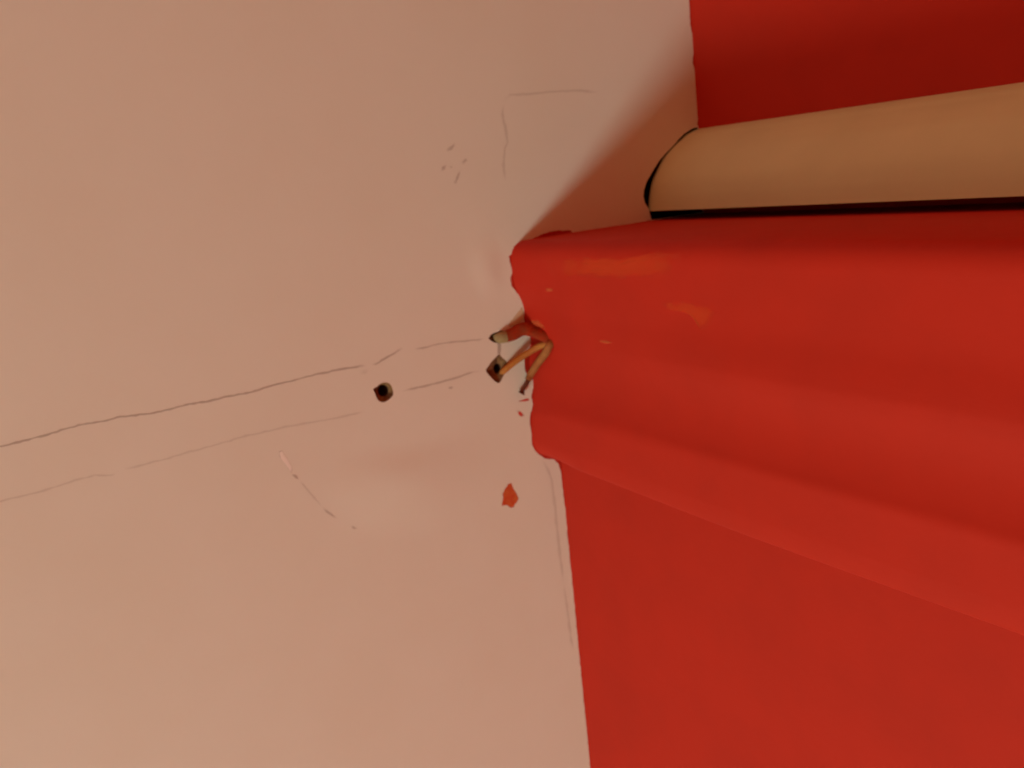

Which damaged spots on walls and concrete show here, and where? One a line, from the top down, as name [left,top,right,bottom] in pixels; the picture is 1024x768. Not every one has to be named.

spalling [486,308,524,383]